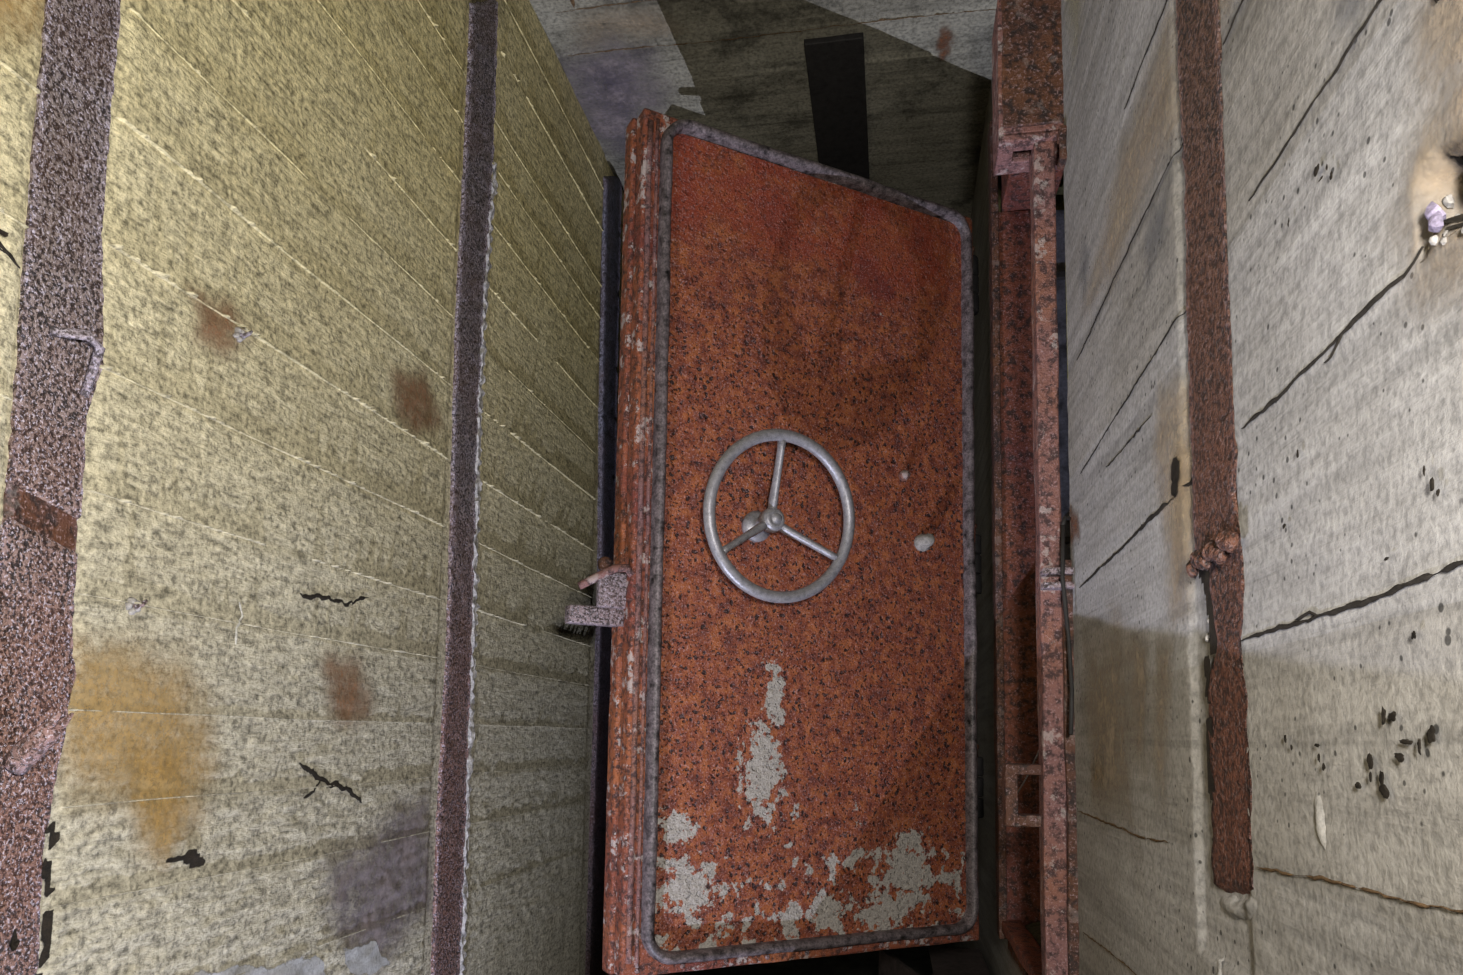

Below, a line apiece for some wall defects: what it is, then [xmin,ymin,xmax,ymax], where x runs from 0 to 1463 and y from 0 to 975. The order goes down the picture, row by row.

crack [1248,0,1382,201]
spalling [1424,194,1463,246]
spalling [1446,152,1463,167]
crack [1241,246,1424,429]
rust [1158,394,1190,549]
crack [1239,560,1463,642]